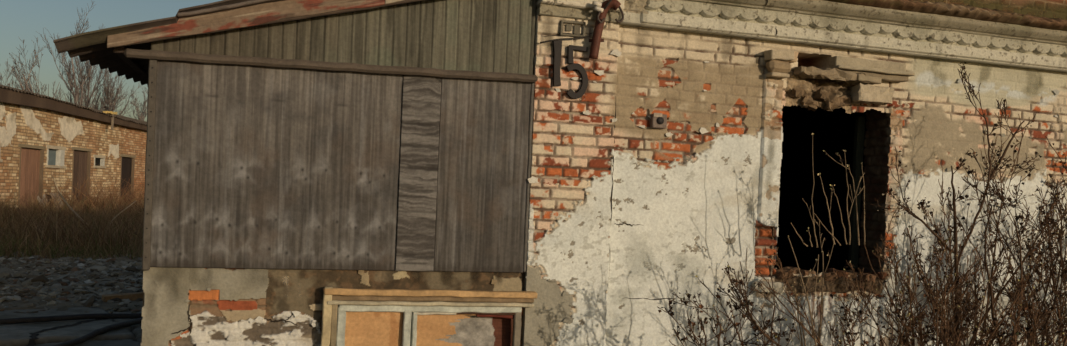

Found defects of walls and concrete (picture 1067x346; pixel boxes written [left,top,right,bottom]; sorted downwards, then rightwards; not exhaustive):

flaking render [0,102,84,147]
flaking render [528,49,769,245]
flaking render [894,68,1067,185]
peeling [673,235,709,272]
peeling [171,288,322,346]
peeling [548,277,585,325]